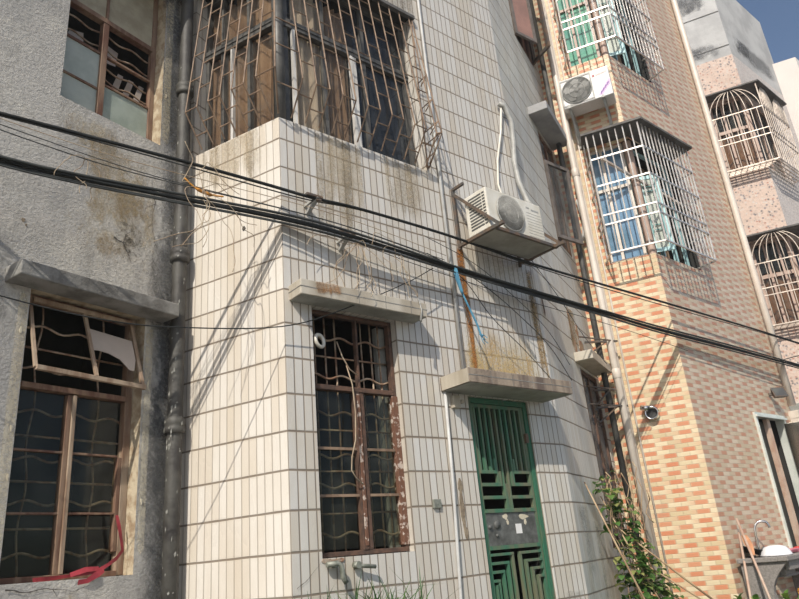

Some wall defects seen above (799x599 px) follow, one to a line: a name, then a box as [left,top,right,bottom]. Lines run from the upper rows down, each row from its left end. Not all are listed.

water stain [151,0,180,302]
corrosion [456,249,549,376]
water stain [143,320,170,599]